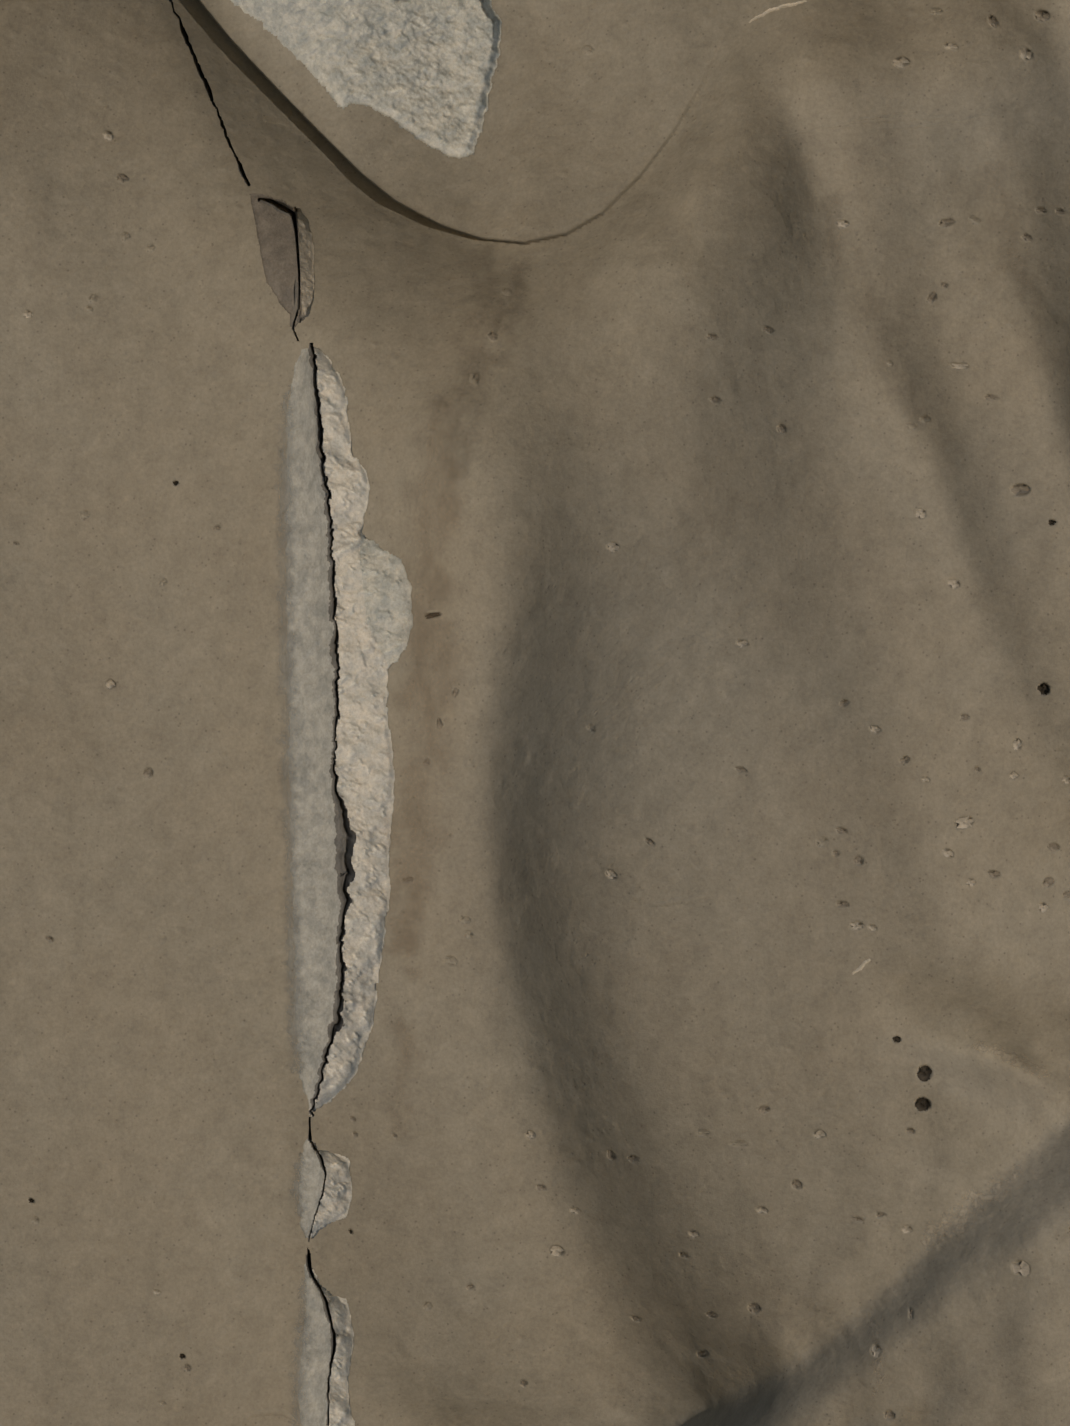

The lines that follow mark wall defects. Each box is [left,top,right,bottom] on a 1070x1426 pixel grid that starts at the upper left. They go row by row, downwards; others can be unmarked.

spalling [231,0,502,159]
spalling [249,193,315,330]
crack [169,0,356,1426]
spalling [279,347,441,1117]
spalling [294,1138,352,1241]
spalling [297,1264,355,1426]